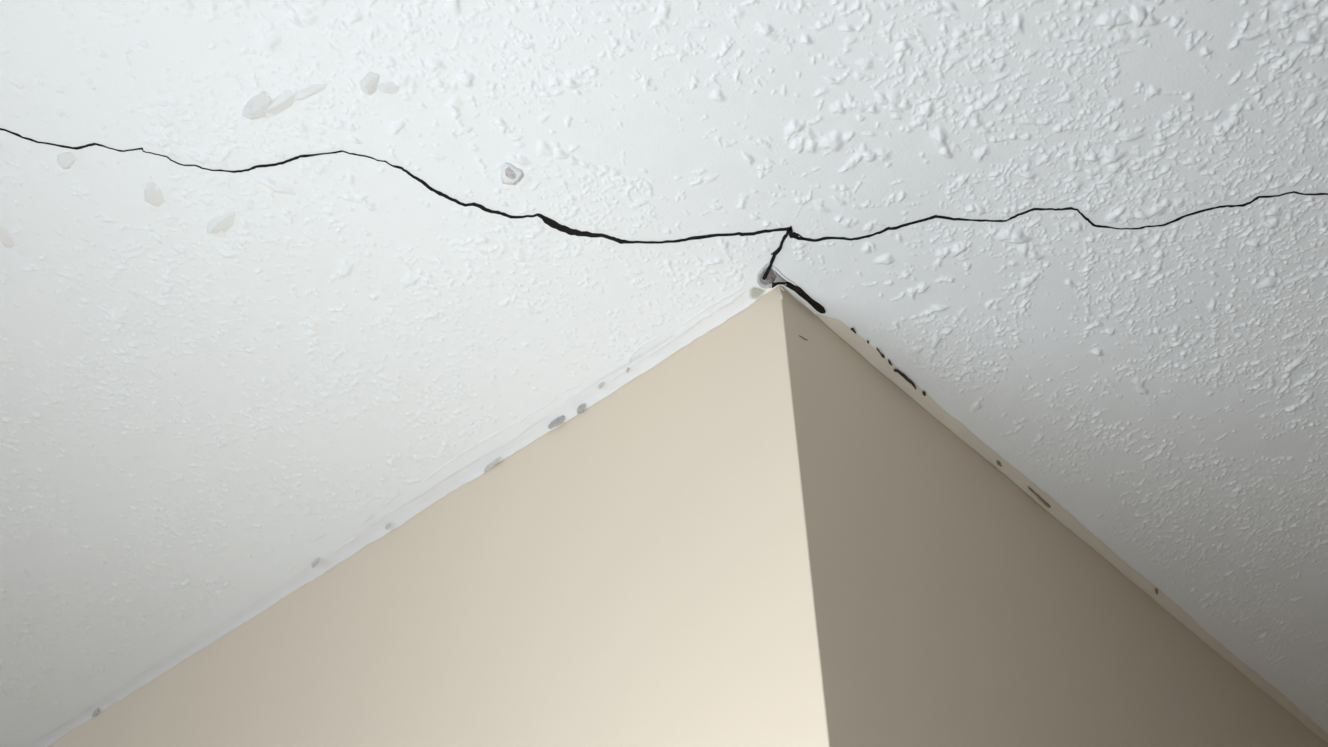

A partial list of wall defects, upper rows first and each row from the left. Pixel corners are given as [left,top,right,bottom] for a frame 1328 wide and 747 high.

crack [0,128,1328,280]